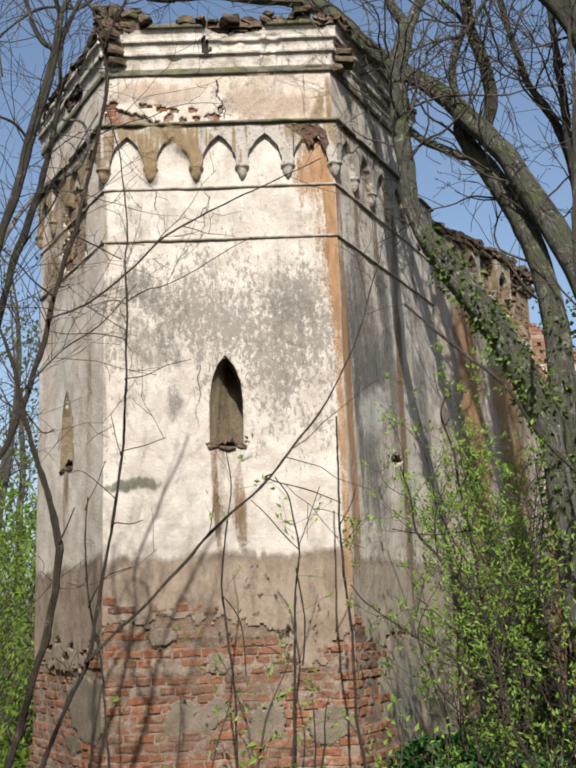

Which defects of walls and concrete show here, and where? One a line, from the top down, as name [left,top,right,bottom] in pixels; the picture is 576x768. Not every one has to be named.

flaking render [105,102,225,124]
flaking render [285,76,332,150]
corrosion [297,139,360,584]
damp [345,247,400,528]
corrosion [391,218,413,588]
corrosion [212,449,223,546]
corrosion [235,483,247,546]
flaking render [26,594,424,768]
damp [34,548,460,741]